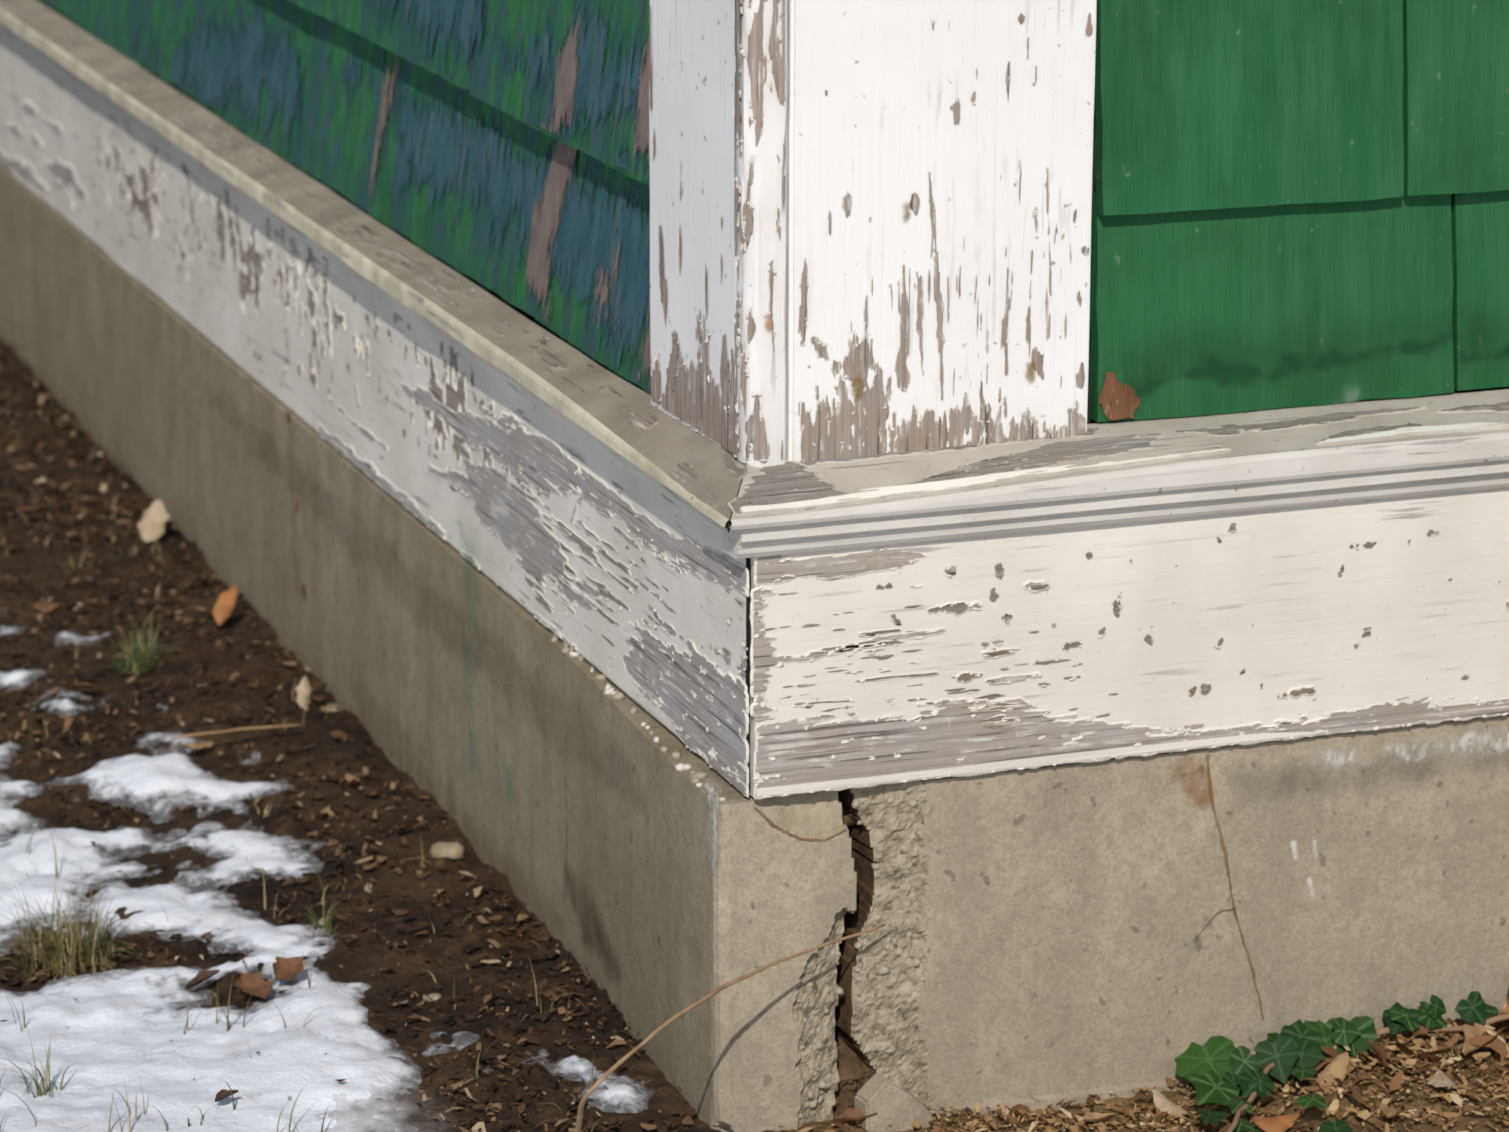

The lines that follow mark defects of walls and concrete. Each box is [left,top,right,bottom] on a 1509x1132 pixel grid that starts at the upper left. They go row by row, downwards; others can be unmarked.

peeling [0,112,169,249]
peeling [307,0,1509,517]
peeling [175,162,1509,1128]
crack [832,788,876,1117]
crack [1195,755,1264,1021]